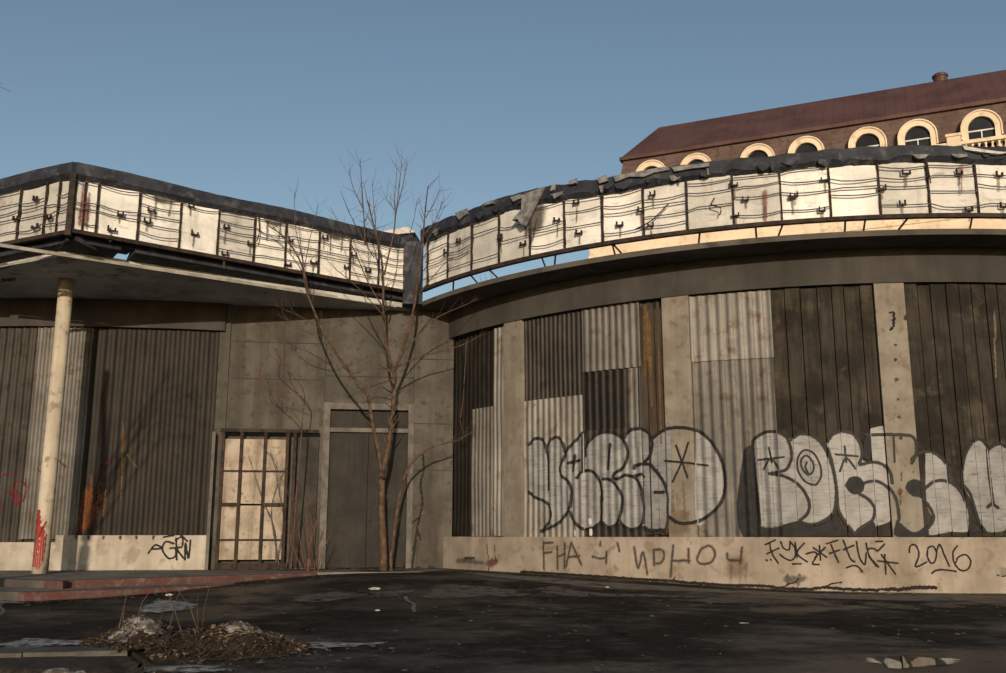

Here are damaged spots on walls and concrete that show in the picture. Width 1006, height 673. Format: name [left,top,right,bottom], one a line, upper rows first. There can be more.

peeling [596,163,711,193]
rust [78,183,90,229]
peeling [510,178,578,226]